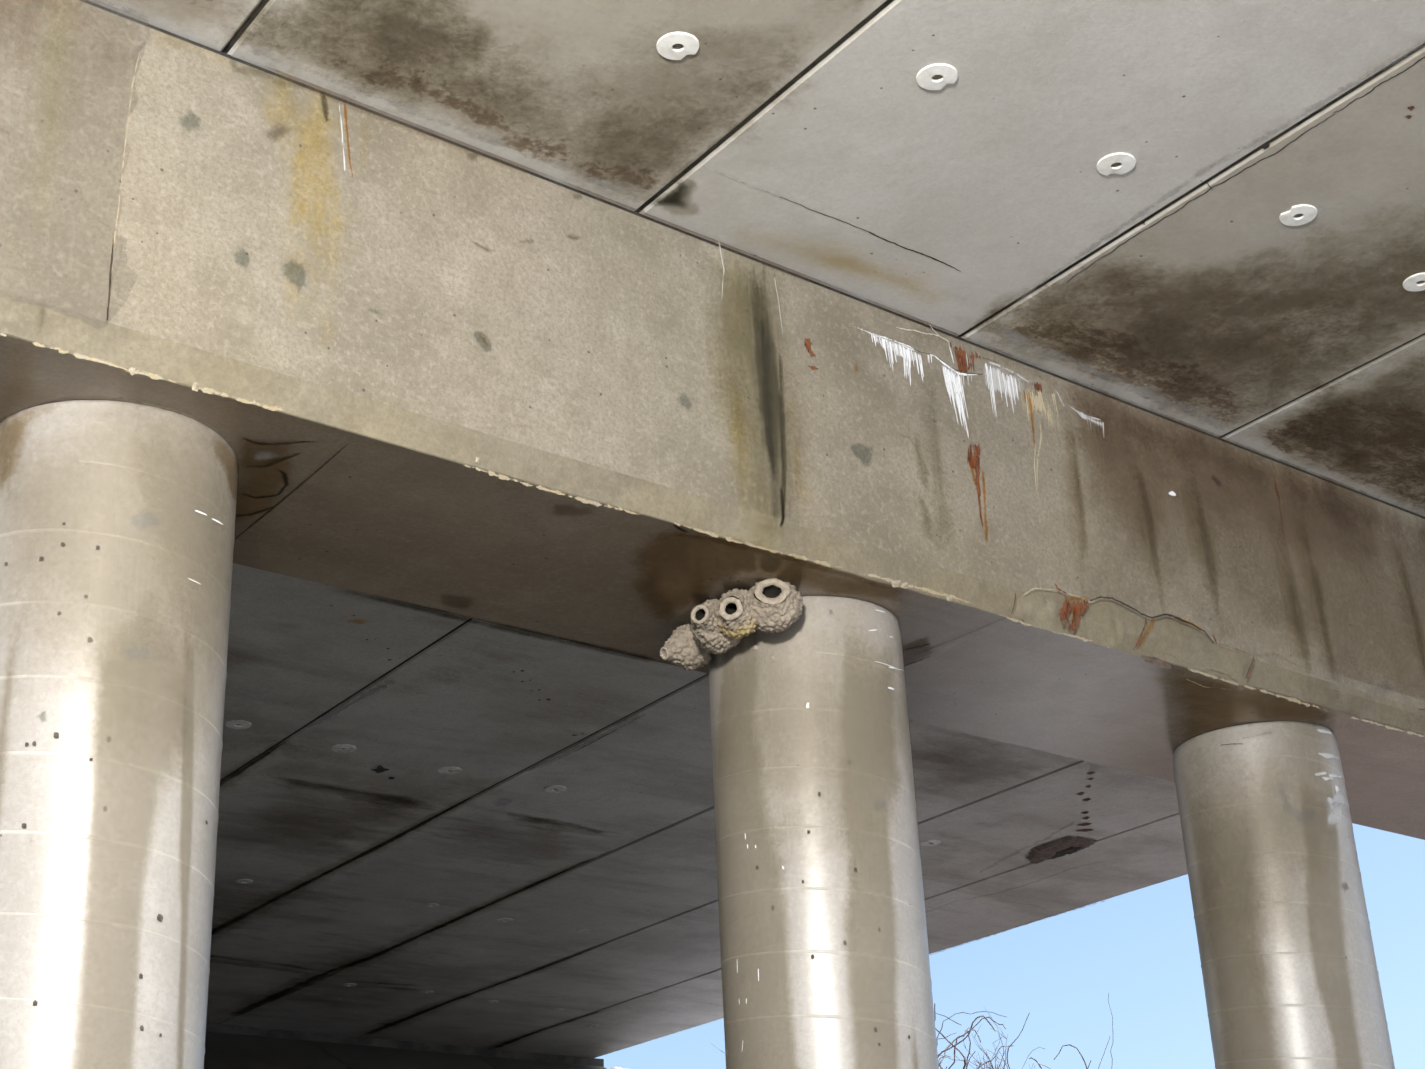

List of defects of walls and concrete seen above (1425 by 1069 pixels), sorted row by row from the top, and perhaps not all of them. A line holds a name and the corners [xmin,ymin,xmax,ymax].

spalling [33,342,173,382]
spalling [192,382,283,411]
damp [855,326,1104,491]
spalling [465,457,636,514]
rust [967,444,983,527]
spalling [675,522,831,567]
spalling [868,574,968,603]
rust [1055,584,1088,633]
spalling [1000,615,1115,649]
spalling [1141,655,1319,708]
spalling [1351,717,1425,737]
spalling [1025,836,1098,864]